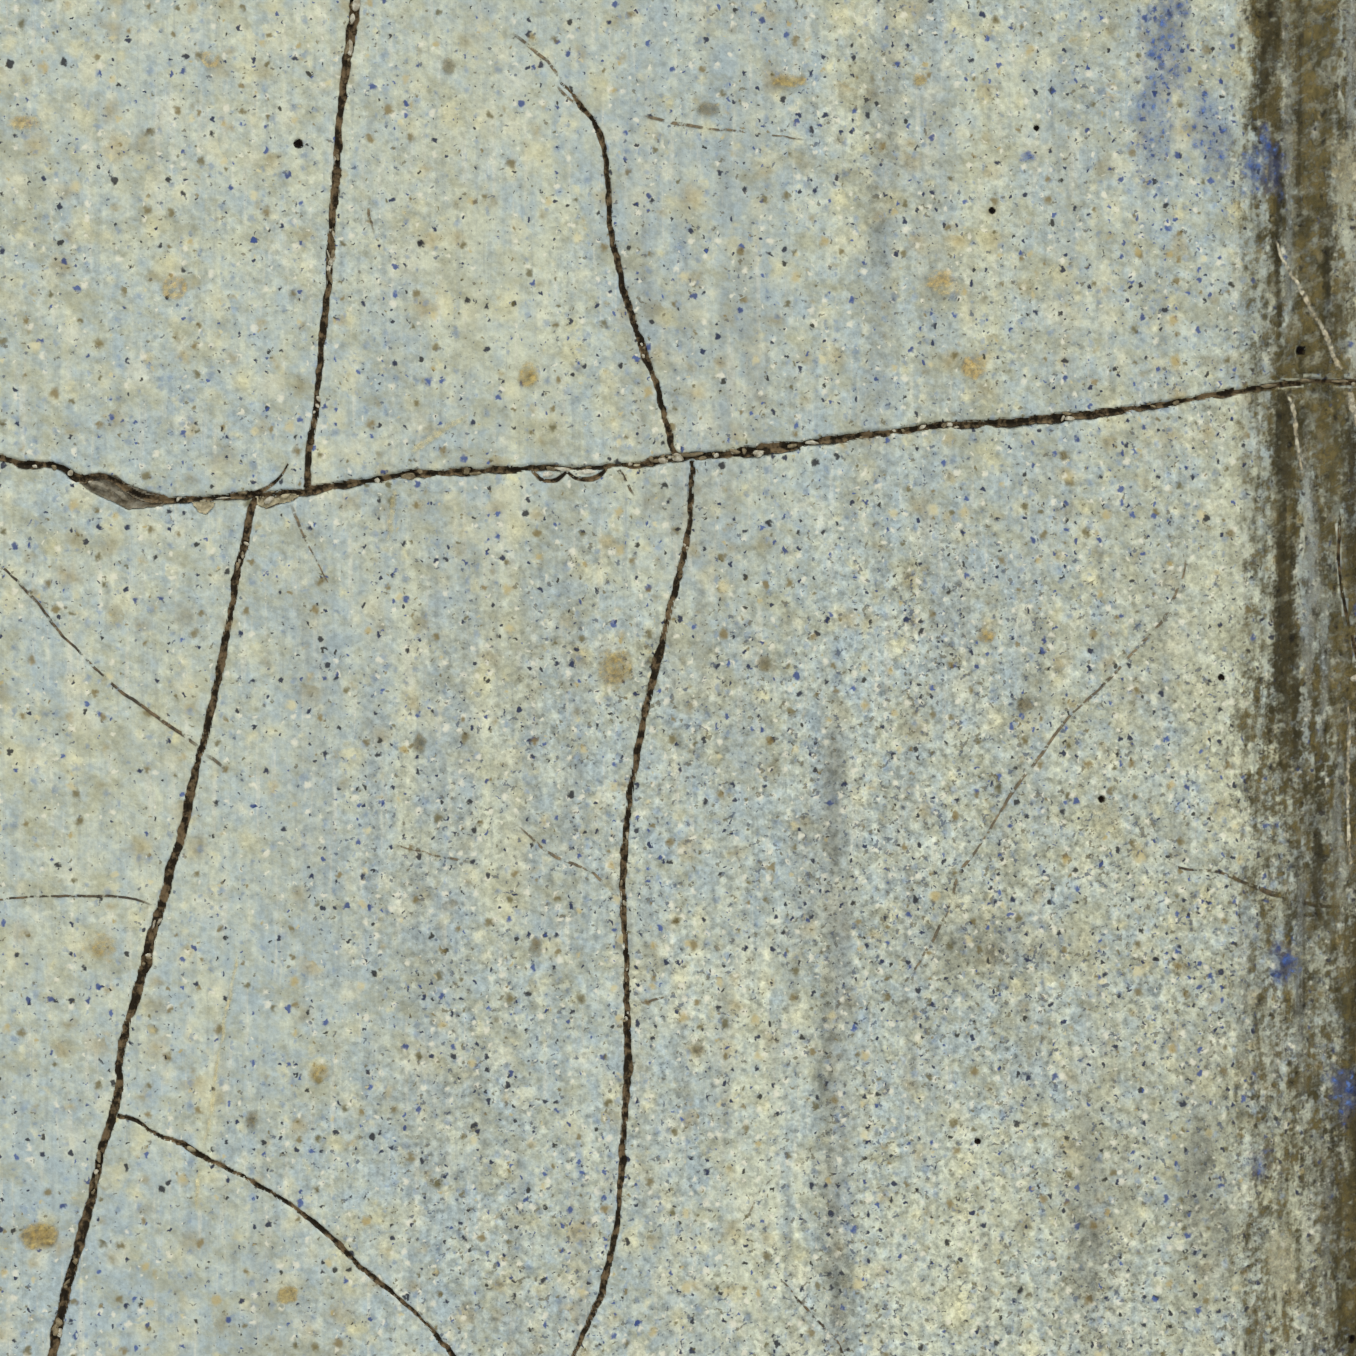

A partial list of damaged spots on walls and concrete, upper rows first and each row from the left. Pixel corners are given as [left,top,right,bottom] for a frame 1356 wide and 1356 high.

crack [0,0,1356,504]
crack [2,568,104,676]
crack [0,894,146,903]
crack [48,496,458,1356]
crack [522,829,602,881]
crack [572,461,696,1356]
leakage [1192,0,1356,1356]